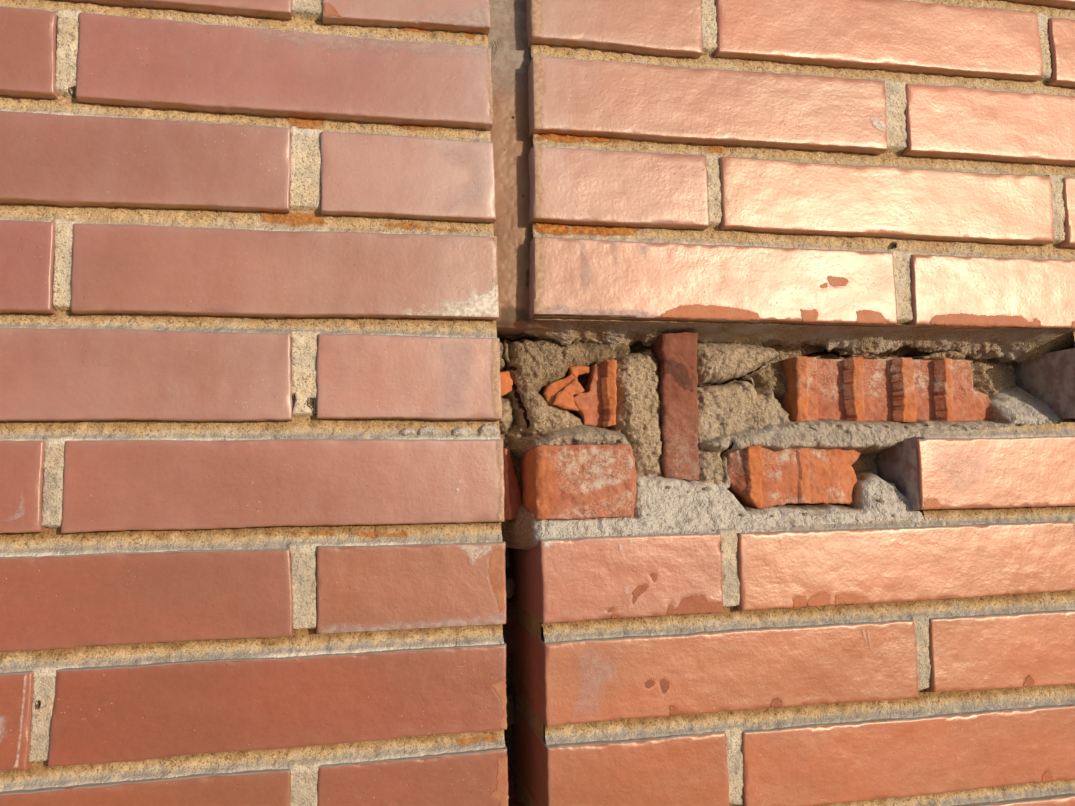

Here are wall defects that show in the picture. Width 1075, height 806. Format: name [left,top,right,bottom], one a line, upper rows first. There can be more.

damp [406,278,499,317]
spalling [399,304,1075,621]